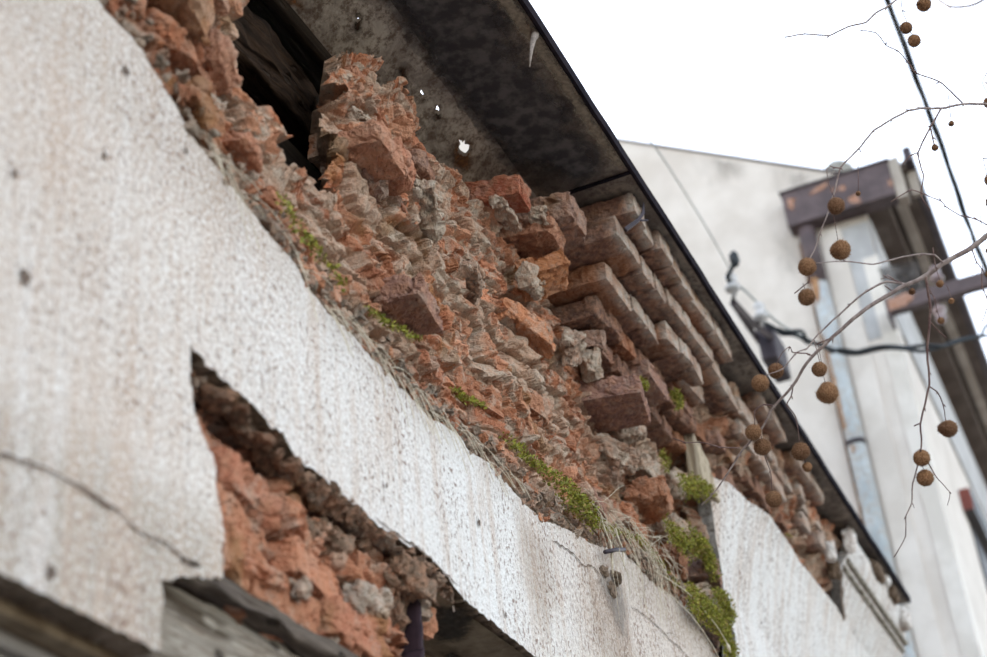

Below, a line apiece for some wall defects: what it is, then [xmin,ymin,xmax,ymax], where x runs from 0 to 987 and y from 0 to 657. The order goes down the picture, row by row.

leakage [393,0,622,183]
flaking render [100,0,843,608]
crack [0,453,194,570]
flaking render [190,367,455,657]
flaking render [698,609,720,653]